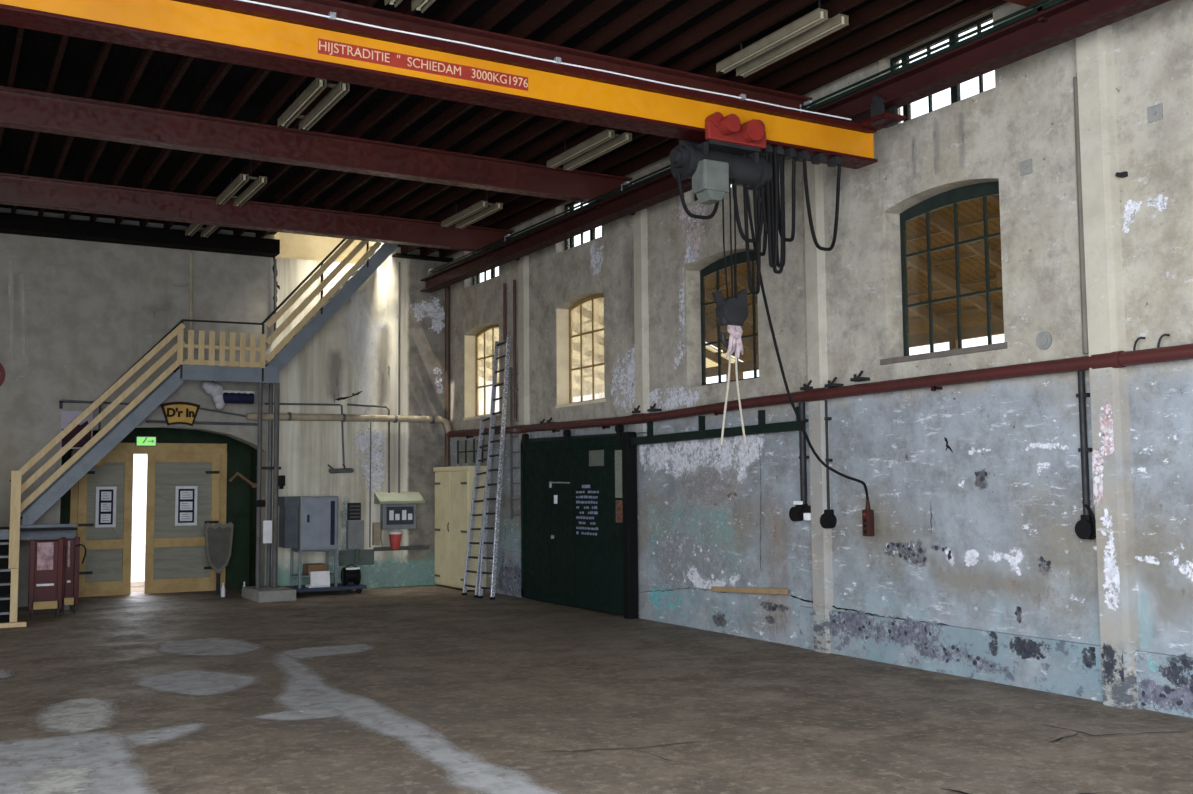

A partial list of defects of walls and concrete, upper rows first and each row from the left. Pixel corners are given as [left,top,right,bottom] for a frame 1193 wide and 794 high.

peeling [639,434,765,483]
peeling [1092,402,1120,611]
peeling [883,540,1025,576]
spalling [1038,556,1051,577]
peeling [1135,555,1193,583]